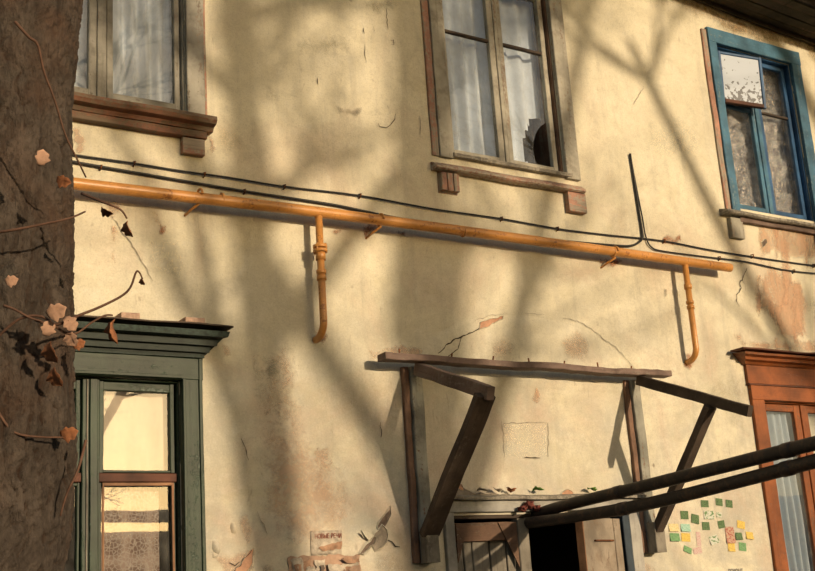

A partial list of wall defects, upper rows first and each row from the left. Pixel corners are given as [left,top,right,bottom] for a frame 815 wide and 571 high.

crack [112,217,153,281]
crack [439,313,504,356]
peeling [229,548,254,571]